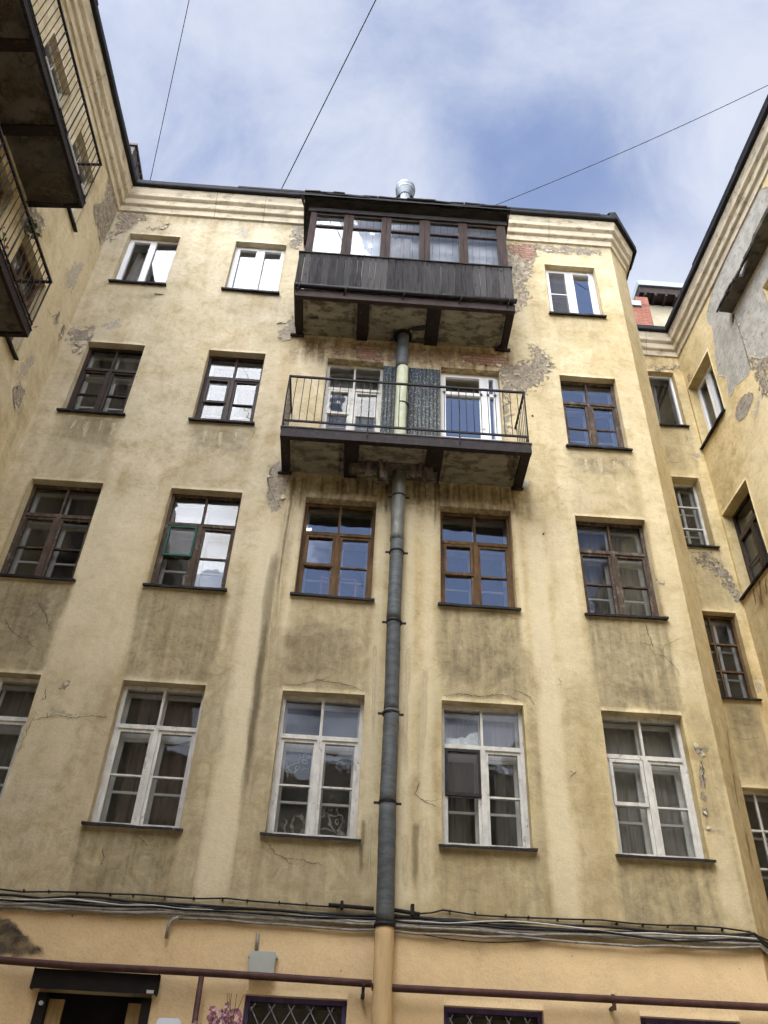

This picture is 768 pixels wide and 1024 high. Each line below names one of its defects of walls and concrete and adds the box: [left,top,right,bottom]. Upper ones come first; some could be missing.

flaking render [93,177,170,245]
flaking render [507,242,602,314]
flaking render [54,312,122,356]
flaking render [13,355,34,408]
flaking render [461,343,556,440]
flaking render [735,351,768,422]
flaking render [267,461,296,513]
flaking render [691,551,740,602]
crack [18,689,104,751]
flaking render [694,742,711,829]